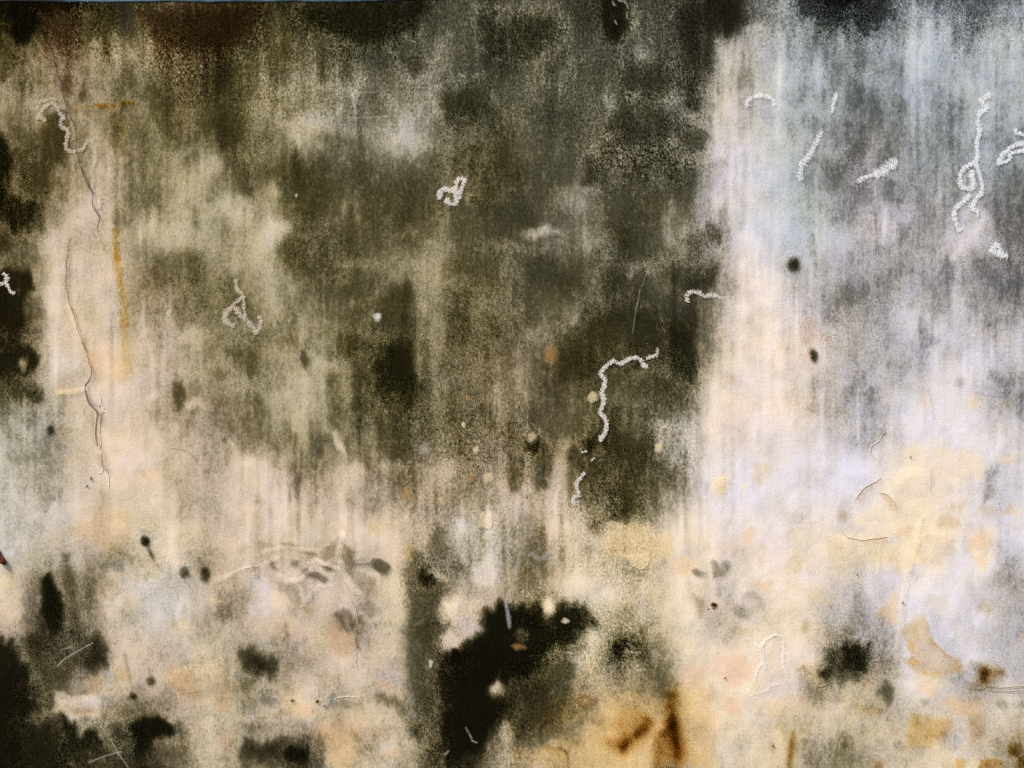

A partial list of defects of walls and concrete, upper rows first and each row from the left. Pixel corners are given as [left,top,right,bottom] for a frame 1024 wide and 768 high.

crack [43,28,100,232]
crack [65,242,111,490]
mould [325,277,422,464]
damp [436,0,749,530]
damp [781,0,1021,191]
damp [976,258,1024,300]
damp [993,165,1024,248]
mould [0,554,187,768]
mould [376,523,598,768]
corrosion [619,718,649,749]
corrosion [663,693,682,758]
mould [819,610,871,686]